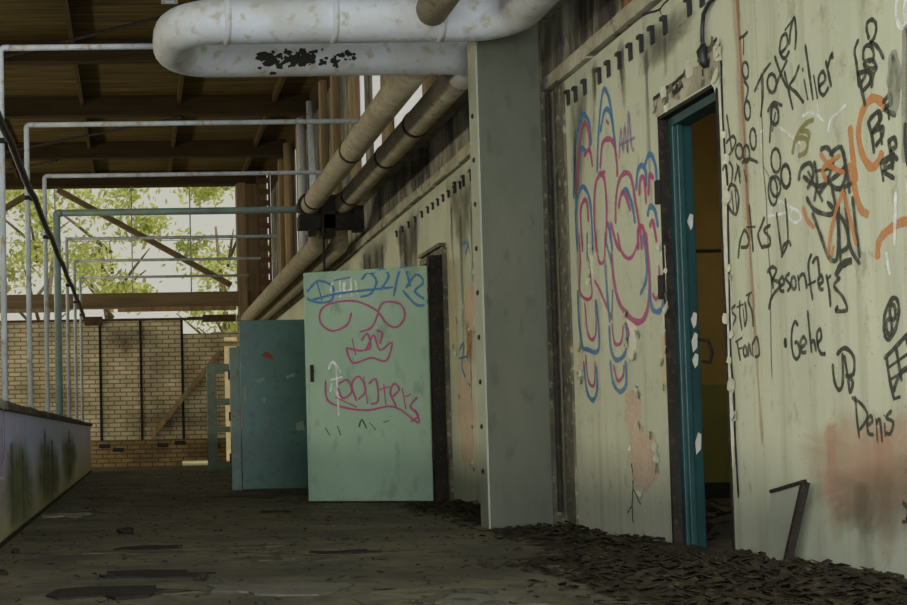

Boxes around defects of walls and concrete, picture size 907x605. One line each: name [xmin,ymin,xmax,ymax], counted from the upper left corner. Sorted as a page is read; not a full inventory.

peeling [255,48,356,75]
peeling [624,385,659,498]